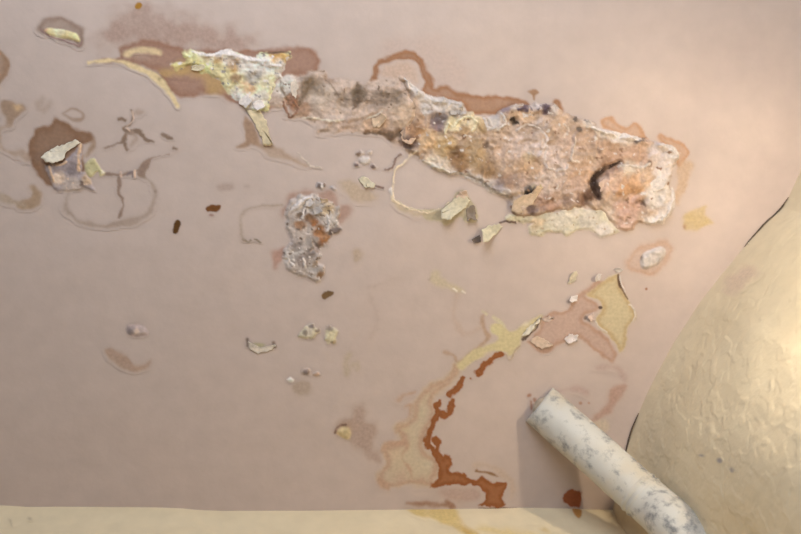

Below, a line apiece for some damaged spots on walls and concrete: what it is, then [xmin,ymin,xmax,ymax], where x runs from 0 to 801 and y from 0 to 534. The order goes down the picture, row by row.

water stain [0,48,12,87]
water stain [0,93,87,165]
flaking render [34,12,88,51]
peeling [25,114,107,193]
crack [101,106,180,218]
water stain [85,0,324,111]
flaking render [169,47,323,171]
water stain [369,28,541,115]
flaking render [267,74,682,366]
water stain [329,267,553,534]
rust [421,350,519,509]
rust [561,488,584,519]